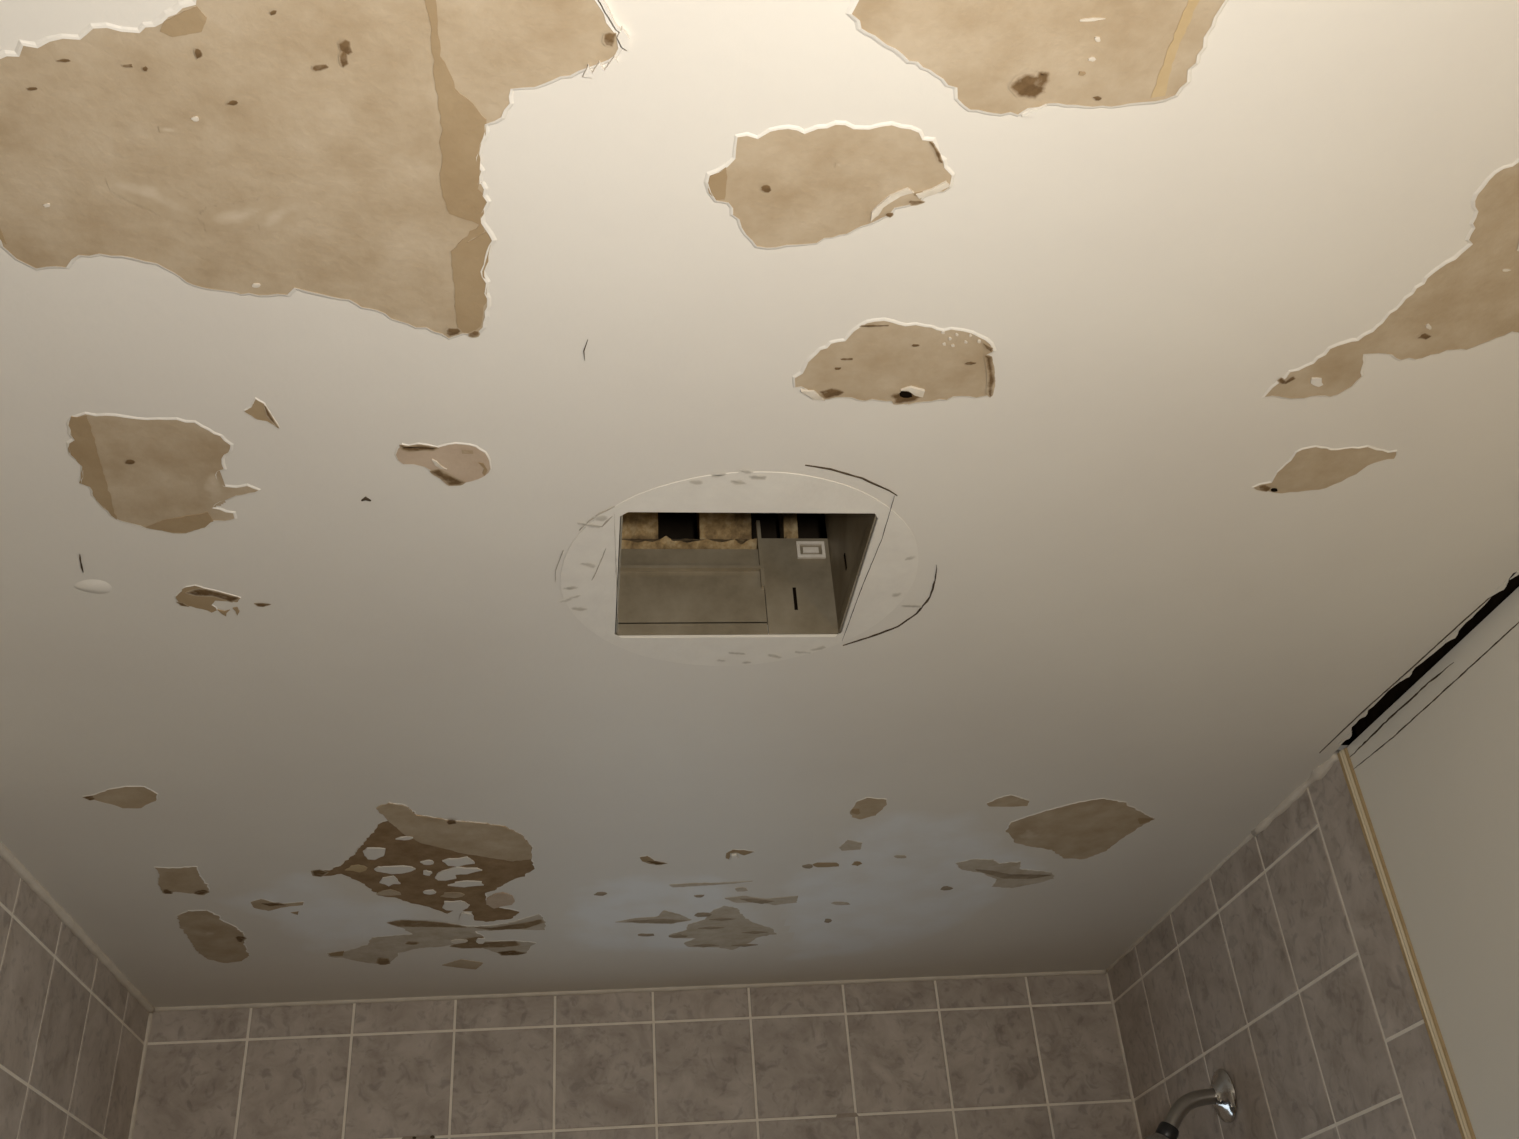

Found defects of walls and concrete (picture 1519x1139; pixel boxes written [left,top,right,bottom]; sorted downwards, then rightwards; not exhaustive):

peeling [845,0,1229,117]
peeling [0,0,630,340]
peeling [704,120,955,250]
peeling [1262,159,1519,400]
peeling [792,317,997,406]
peeling [66,412,261,534]
peeling [394,442,492,486]
peeling [1252,445,1398,494]
peeling [175,585,271,616]
crack [1319,596,1519,769]
peeling [311,802,547,969]
peeling [955,794,1154,888]